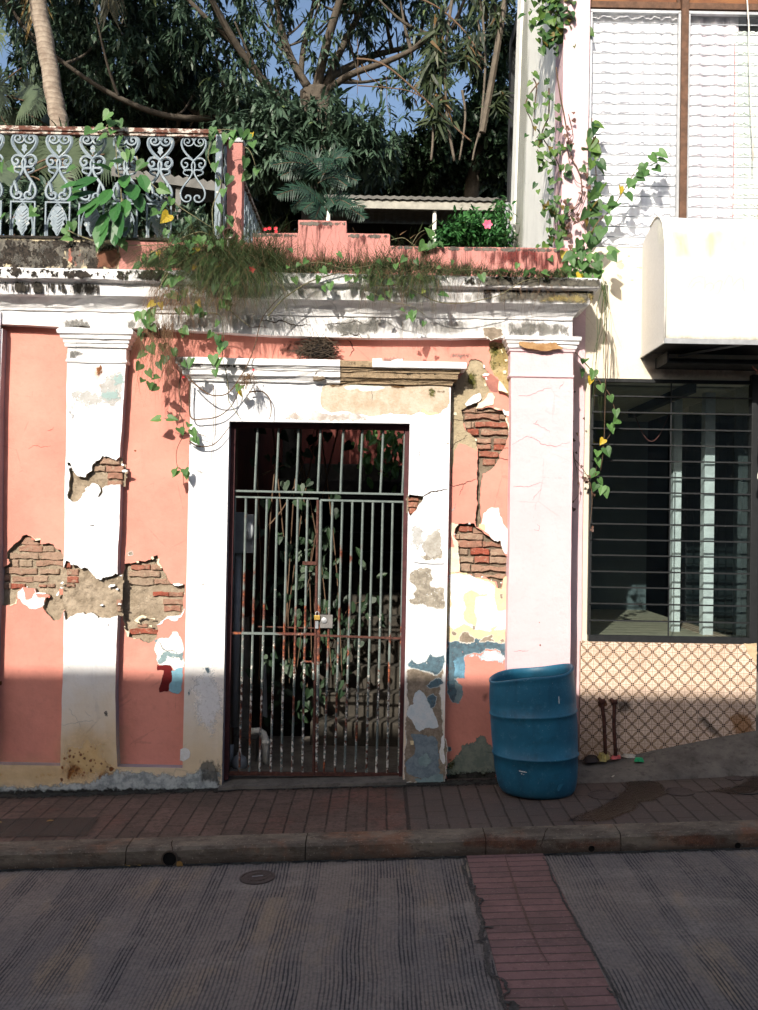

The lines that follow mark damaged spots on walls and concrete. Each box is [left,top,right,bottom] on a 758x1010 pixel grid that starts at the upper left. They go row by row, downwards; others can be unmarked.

mould [0,238,164,295]
mould [509,319,569,336]
peeling [519,341,563,351]
peeling [71,372,124,418]
spalling [67,456,128,502]
peeling [285,327,509,783]
spalling [4,535,220,732]
rust [60,746,114,782]
leakage [0,746,221,795]